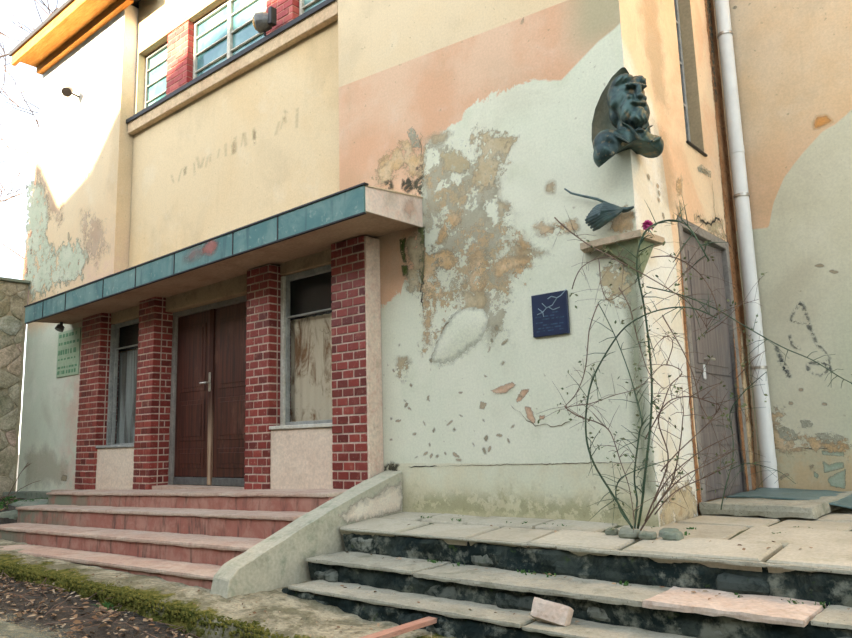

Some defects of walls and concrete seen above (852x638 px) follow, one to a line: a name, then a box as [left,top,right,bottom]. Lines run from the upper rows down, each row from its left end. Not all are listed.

flaking render [23,144,105,301]
flaking render [375,128,542,352]
flaking render [535,220,578,235]
flaking render [610,206,634,233]
crack [696,188,732,249]
flaking render [393,357,408,377]
flaking render [772,407,850,489]